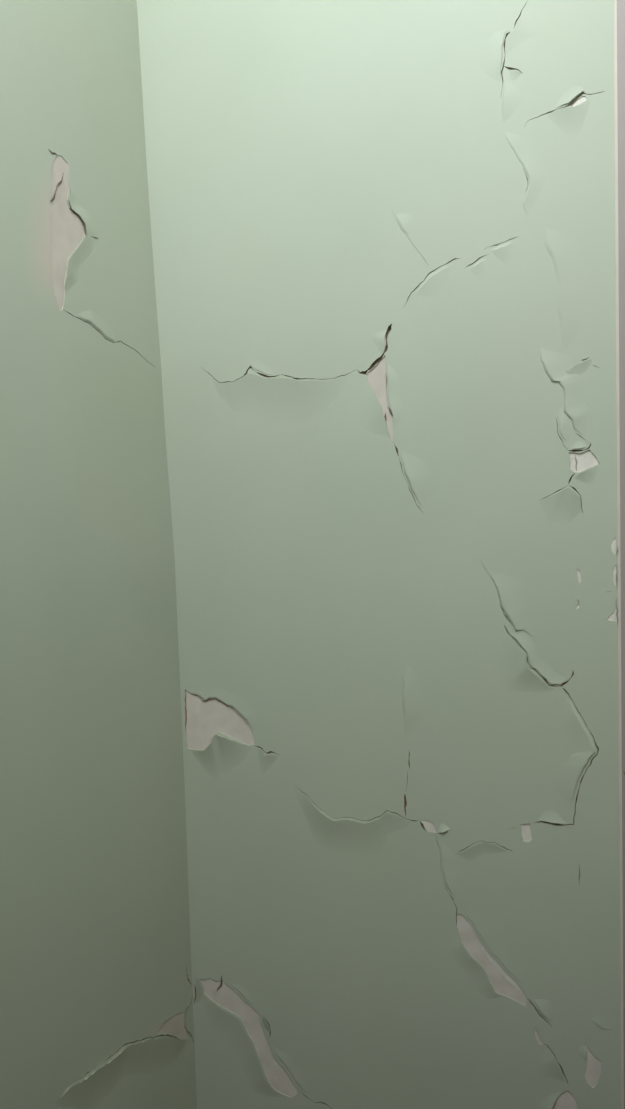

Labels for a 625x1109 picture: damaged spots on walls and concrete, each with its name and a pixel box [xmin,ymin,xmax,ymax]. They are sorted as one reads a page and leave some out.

crack [479,1,604,135]
peeling [19,151,97,316]
crack [63,309,156,368]
peeling [540,347,600,485]
crack [395,446,435,510]
spalling [185,686,256,780]
crack [481,562,599,826]
spalling [452,900,527,1006]
crack [56,967,205,1109]
crack [528,999,568,1083]
spalling [537,1090,577,1109]